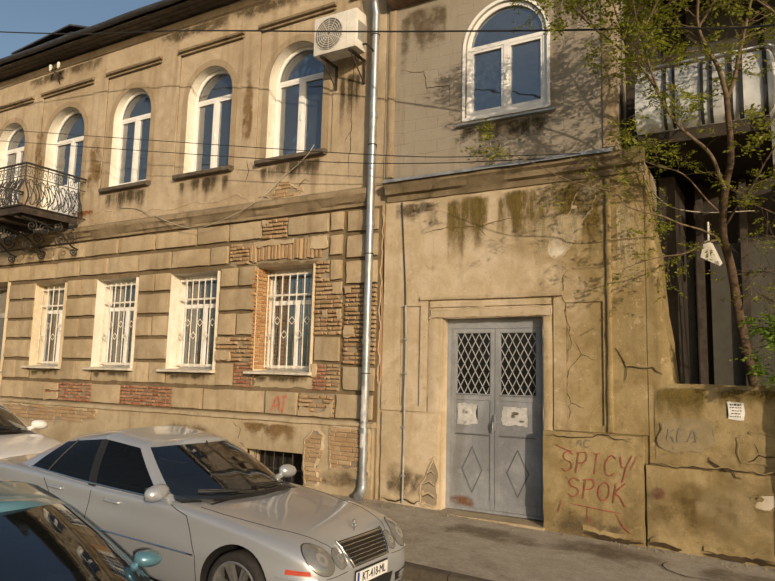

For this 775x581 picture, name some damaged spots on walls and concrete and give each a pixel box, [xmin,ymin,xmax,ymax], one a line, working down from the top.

damp [341,75,360,100]
crack [403,70,450,103]
damp [89,148,100,181]
damp [448,197,486,245]
flaking render [297,213,386,487]
crack [551,270,632,443]
crack [615,347,663,381]
spalling [0,382,98,424]
flaking render [119,385,172,407]
crack [651,444,775,479]
spalling [750,493,775,513]